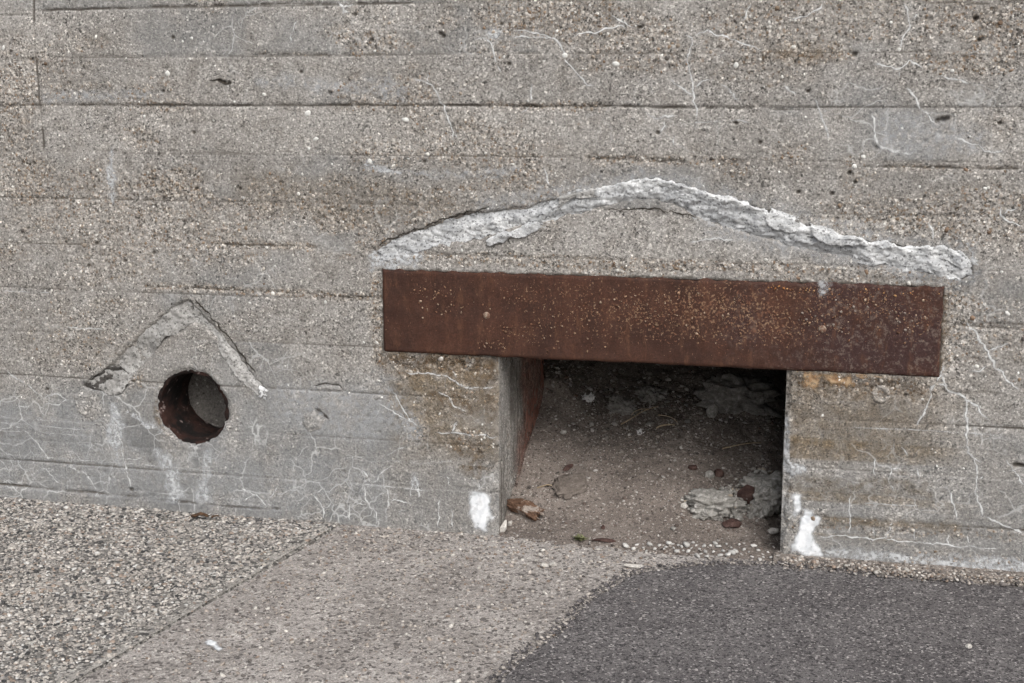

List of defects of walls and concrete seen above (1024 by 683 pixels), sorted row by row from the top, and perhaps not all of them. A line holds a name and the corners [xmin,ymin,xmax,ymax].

spalling [0,0,1024,455]
crack [8,372,212,489]
crack [242,488,287,505]
crack [304,382,342,419]
crack [314,447,453,527]
crack [382,372,495,438]
corrosion [478,285,929,466]
crack [822,367,1022,549]
crack [967,322,1018,389]